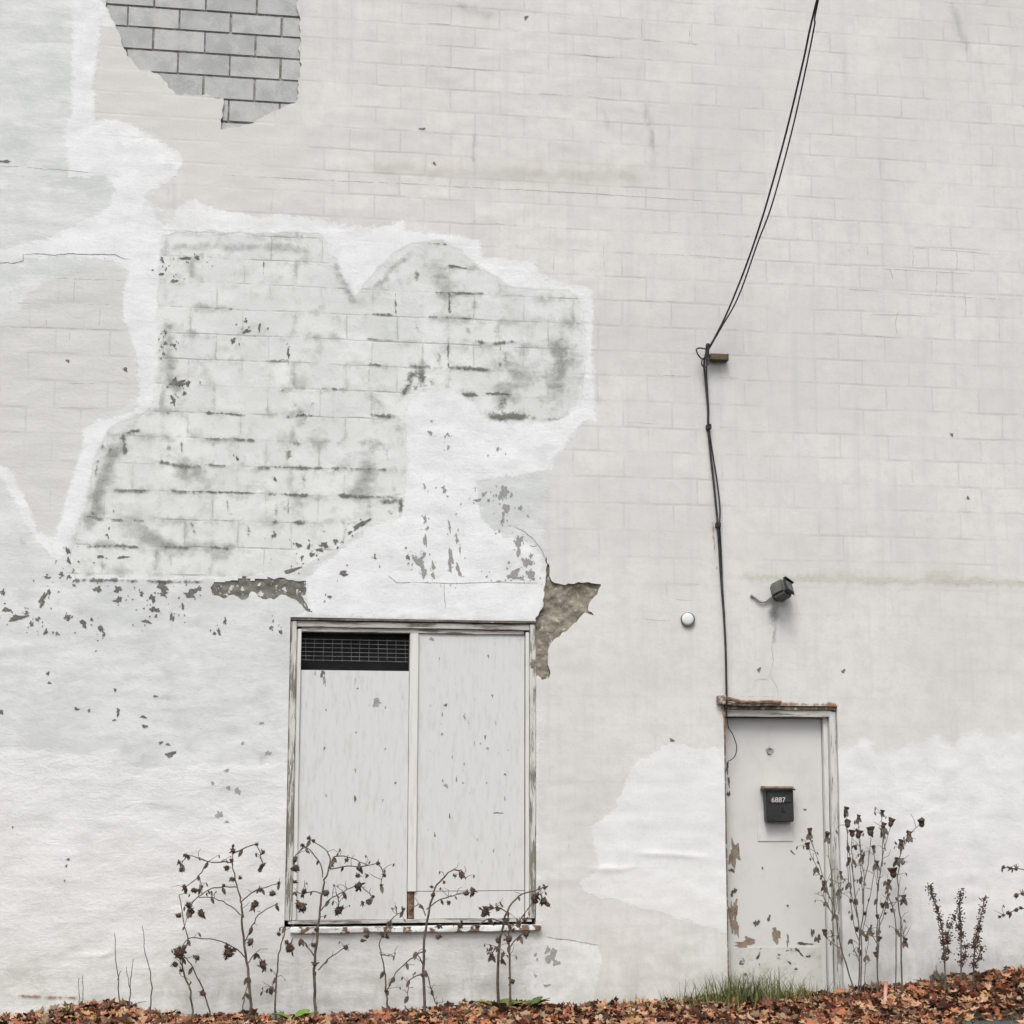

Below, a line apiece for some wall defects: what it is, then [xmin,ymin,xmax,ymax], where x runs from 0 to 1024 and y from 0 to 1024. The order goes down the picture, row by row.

spalling [106,0,302,129]
peeling [0,230,585,635]
peeling [64,612,105,651]
spalling [405,485,601,680]
peeling [728,838,741,872]
peeling [728,888,821,970]